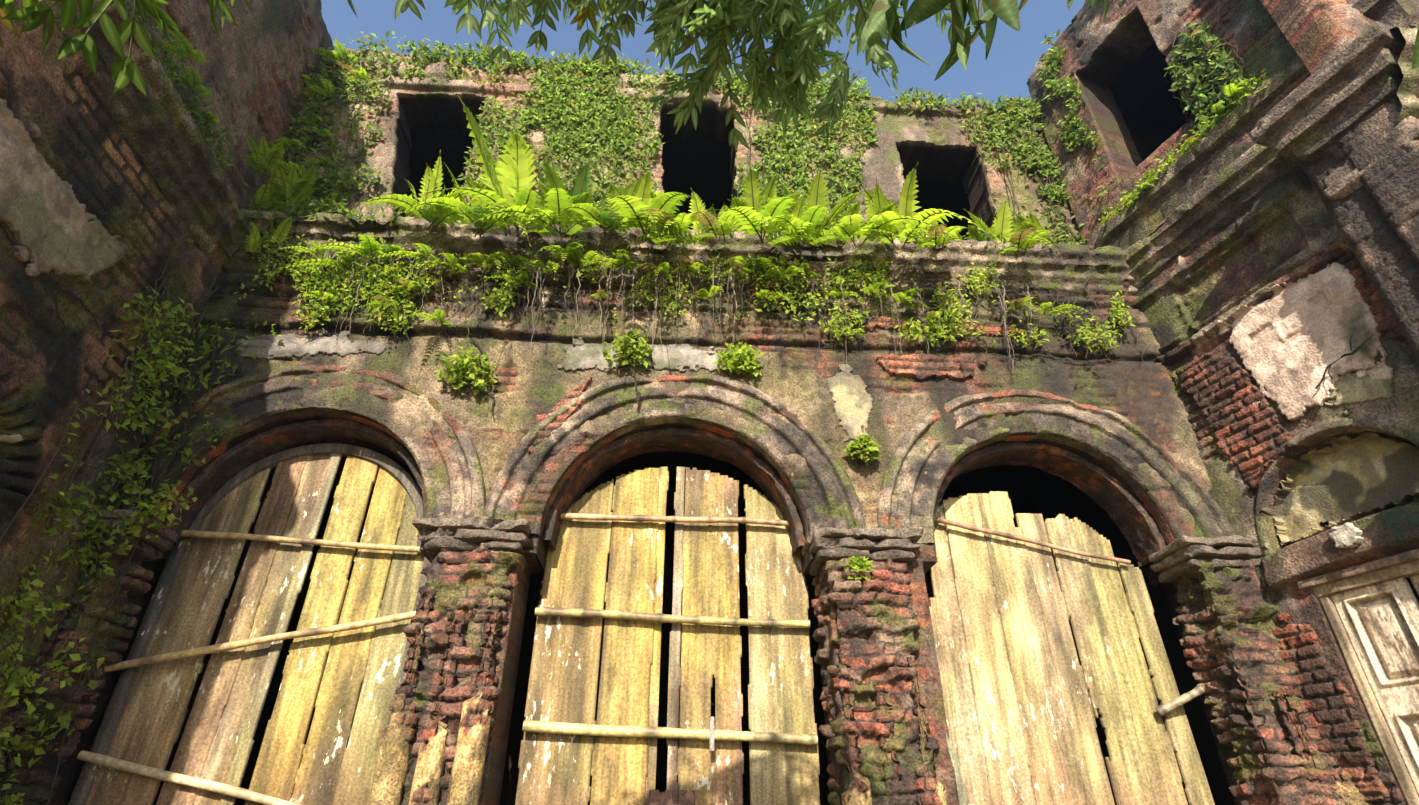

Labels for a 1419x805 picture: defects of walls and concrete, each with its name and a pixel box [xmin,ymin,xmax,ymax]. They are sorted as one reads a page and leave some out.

flaking render [0,98,128,282]
flaking render [0,434,24,444]
flaking render [1177,250,1419,549]
spalling [1271,613,1390,801]